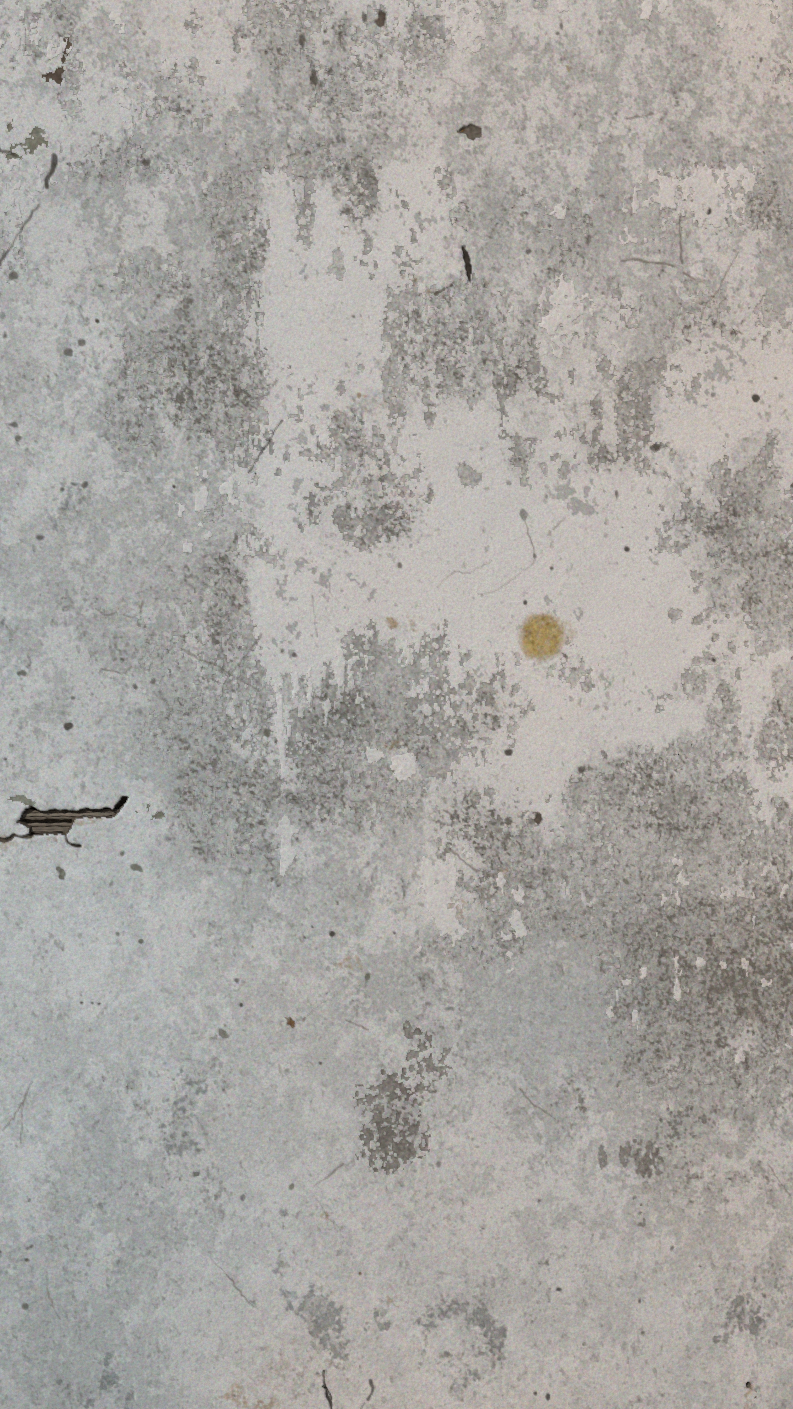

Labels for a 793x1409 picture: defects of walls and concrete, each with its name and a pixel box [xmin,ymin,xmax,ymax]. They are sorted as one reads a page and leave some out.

rust [523,616,563,657]
crack [0,834,81,847]
crack [322,1370,332,1409]